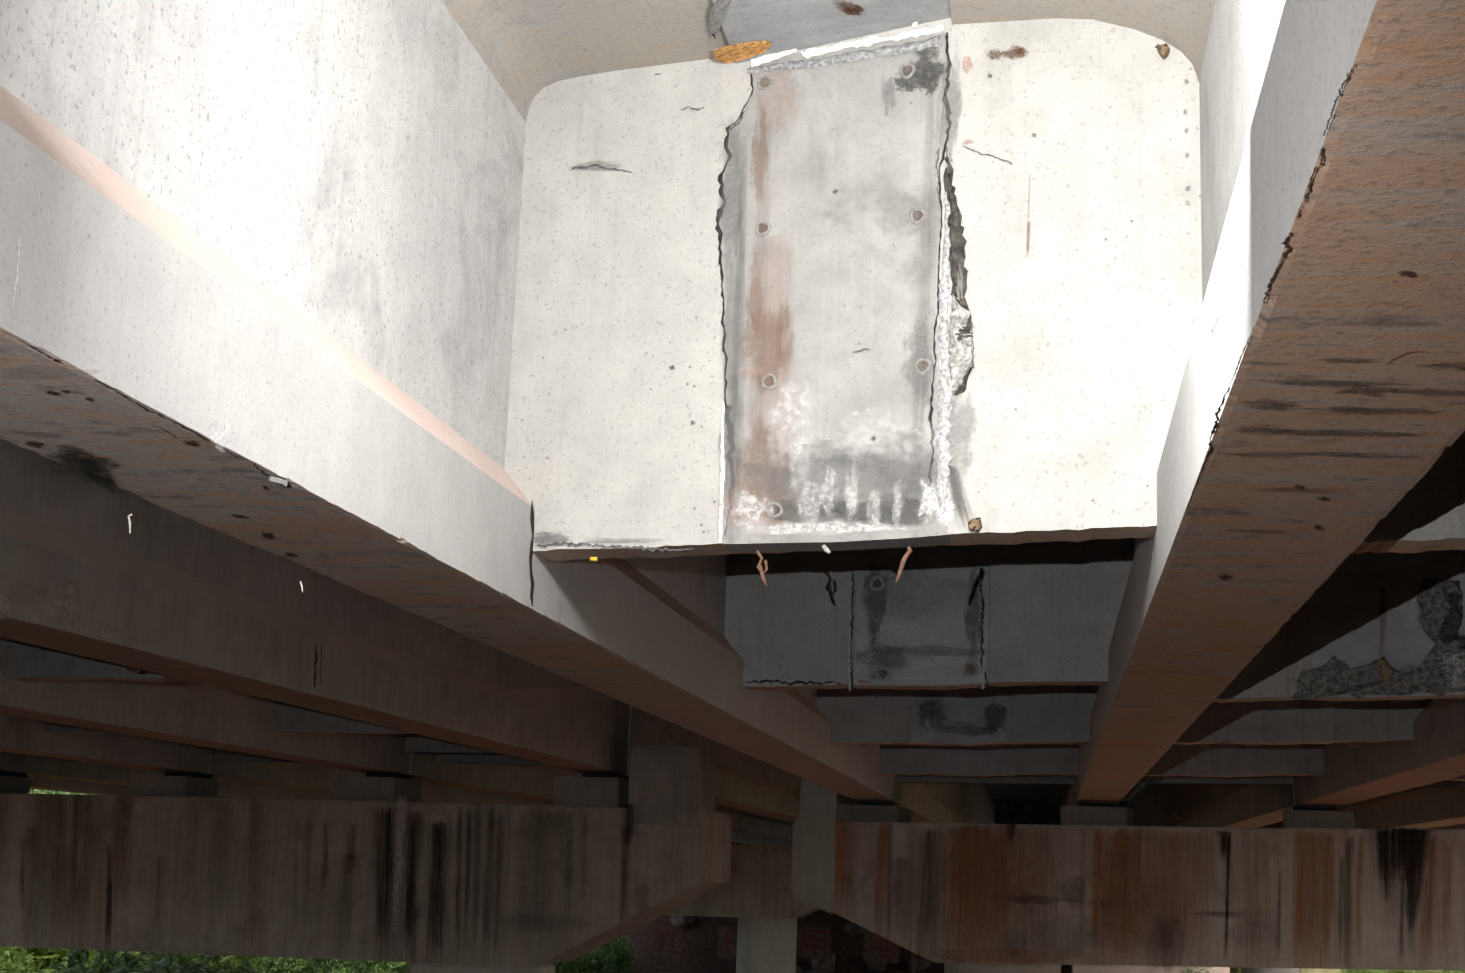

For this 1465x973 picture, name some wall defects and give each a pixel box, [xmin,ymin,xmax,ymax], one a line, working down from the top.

rust [714,40,771,63]
peeling [750,22,943,67]
rust [989,46,1025,60]
spalling [943,147,975,395]
crack [529,73,754,606]
water stain [833,466,967,526]
spalling [1292,578,1465,700]
water stain [377,796,493,962]
water stain [1377,827,1428,949]